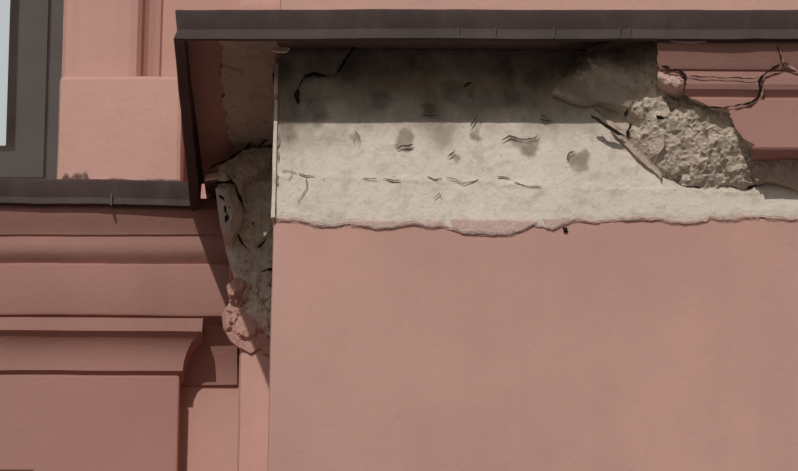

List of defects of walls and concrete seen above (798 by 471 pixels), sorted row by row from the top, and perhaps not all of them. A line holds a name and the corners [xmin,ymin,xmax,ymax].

crack [294,47,355,105]
crack [662,45,798,109]
crack [208,139,268,170]
flaking render [205,41,798,338]
crack [226,277,250,307]